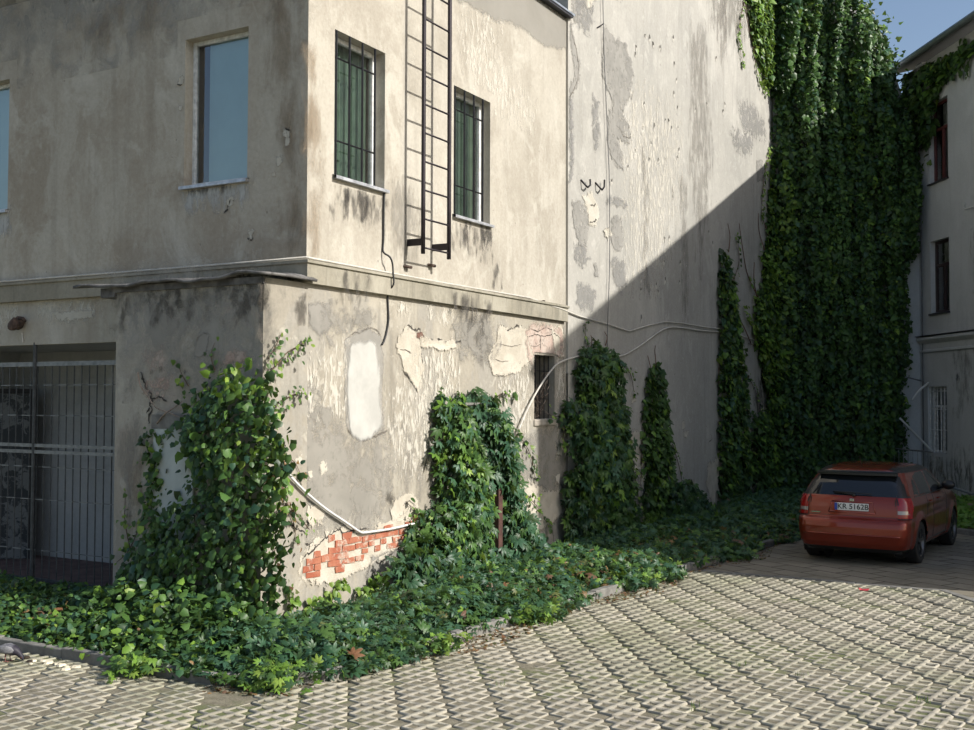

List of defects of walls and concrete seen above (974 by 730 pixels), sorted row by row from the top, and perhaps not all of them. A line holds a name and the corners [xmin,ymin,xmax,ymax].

peeling [571,0,594,37]
peeling [592,26,637,171]
damp [345,191,387,220]
damp [463,222,492,253]
peeling [572,191,627,290]
peeling [576,282,596,311]
spalling [396,324,461,393]
spalling [488,323,564,377]
flaking render [290,492,419,593]